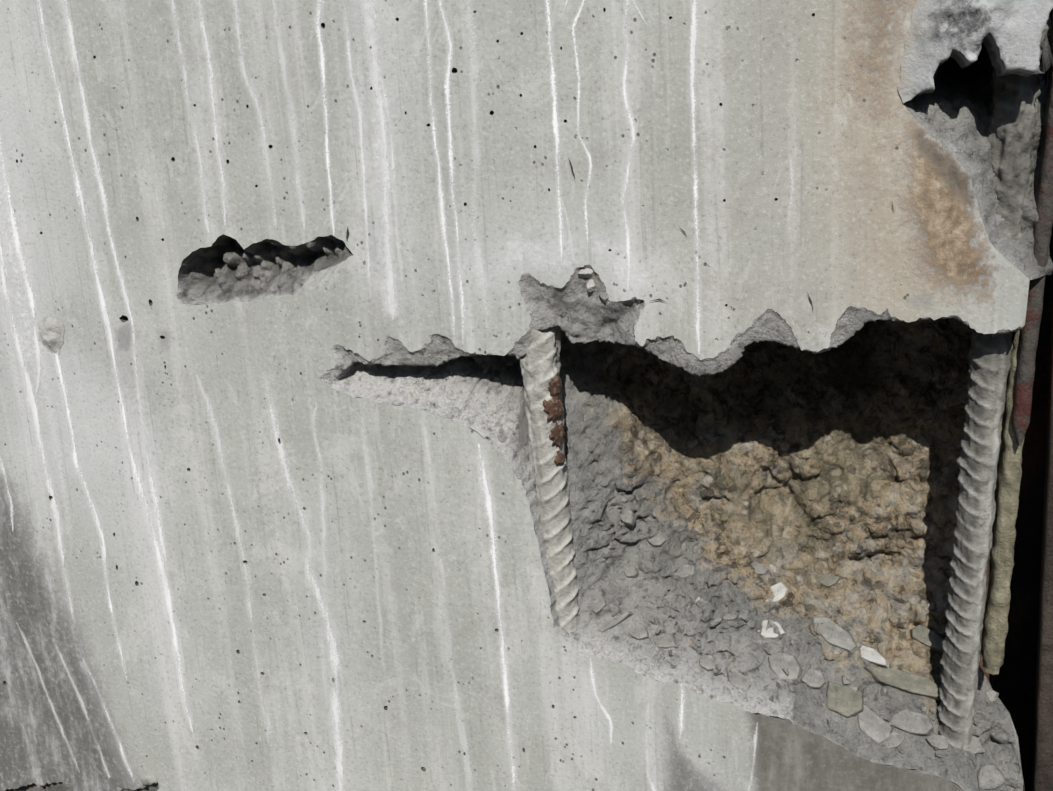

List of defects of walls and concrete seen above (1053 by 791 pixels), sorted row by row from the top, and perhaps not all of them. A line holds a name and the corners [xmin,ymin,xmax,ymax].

damp [0,138,141,791]
damp [37,0,193,732]
spalling [176,234,353,305]
damp [316,0,335,234]
damp [424,0,464,338]
damp [478,444,515,782]
corrosion [543,376,566,465]
spalling [319,264,1025,791]
damp [690,0,701,355]
corrosion [842,0,916,122]
corrosion [895,118,997,305]
spalling [903,12,1053,280]